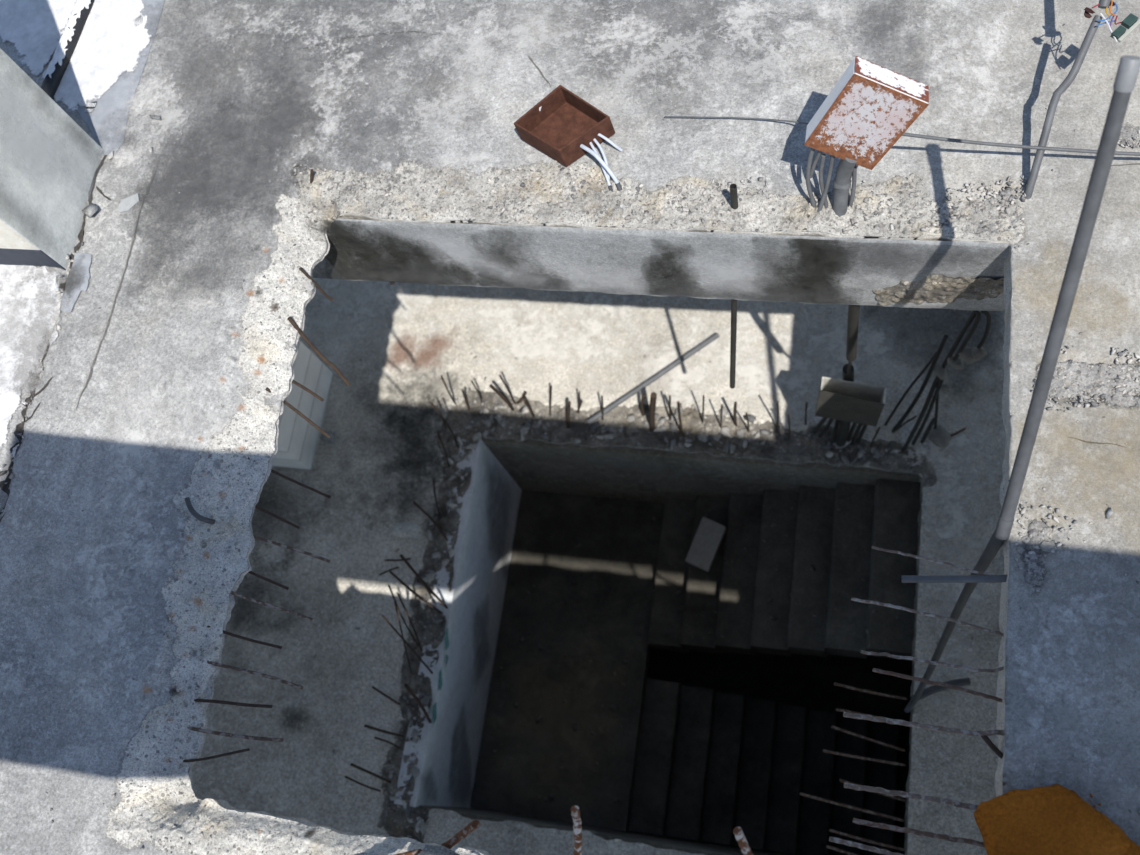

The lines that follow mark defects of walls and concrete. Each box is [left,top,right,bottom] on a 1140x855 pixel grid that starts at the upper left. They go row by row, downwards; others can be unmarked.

water stain [128,0,435,287]
crack [0,155,111,527]
spalling [102,159,1029,855]
water stain [304,214,972,423]
water stain [897,406,998,707]
spalling [1013,502,1078,597]
spalling [1047,345,1140,412]